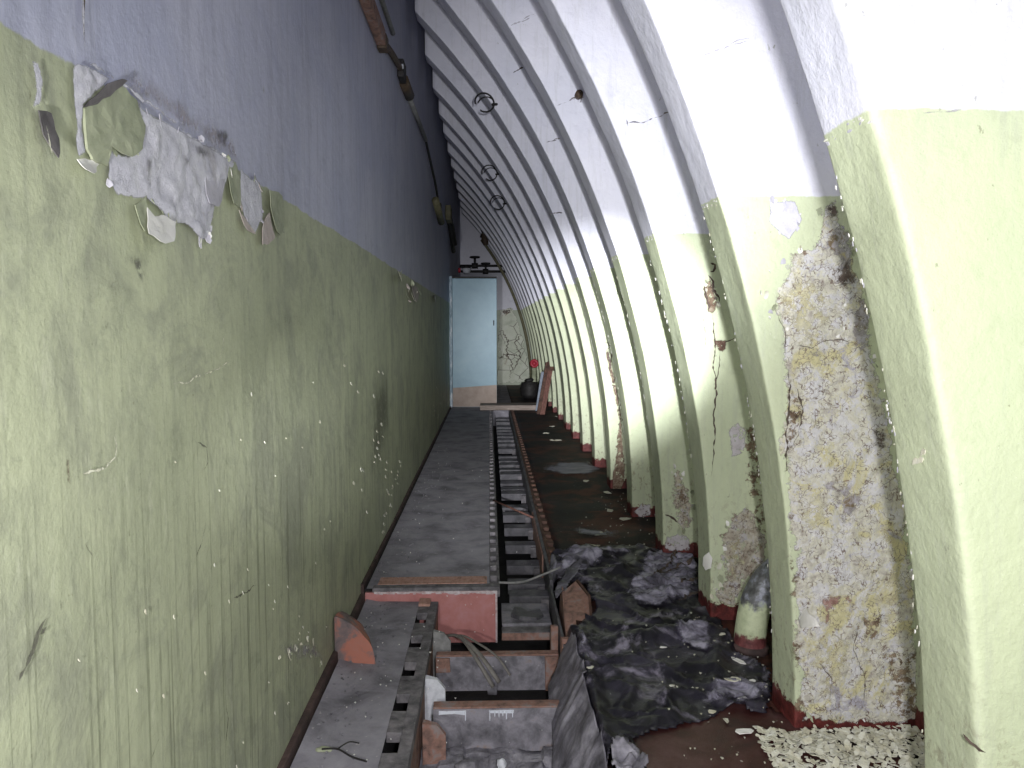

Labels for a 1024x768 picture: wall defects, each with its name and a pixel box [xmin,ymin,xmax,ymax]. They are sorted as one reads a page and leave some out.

peeling [33,62,60,158]
peeling [73,63,285,249]
spalling [665,464,696,551]
crack [703,318,735,475]
spalling [702,397,768,606]
spalling [760,176,920,725]